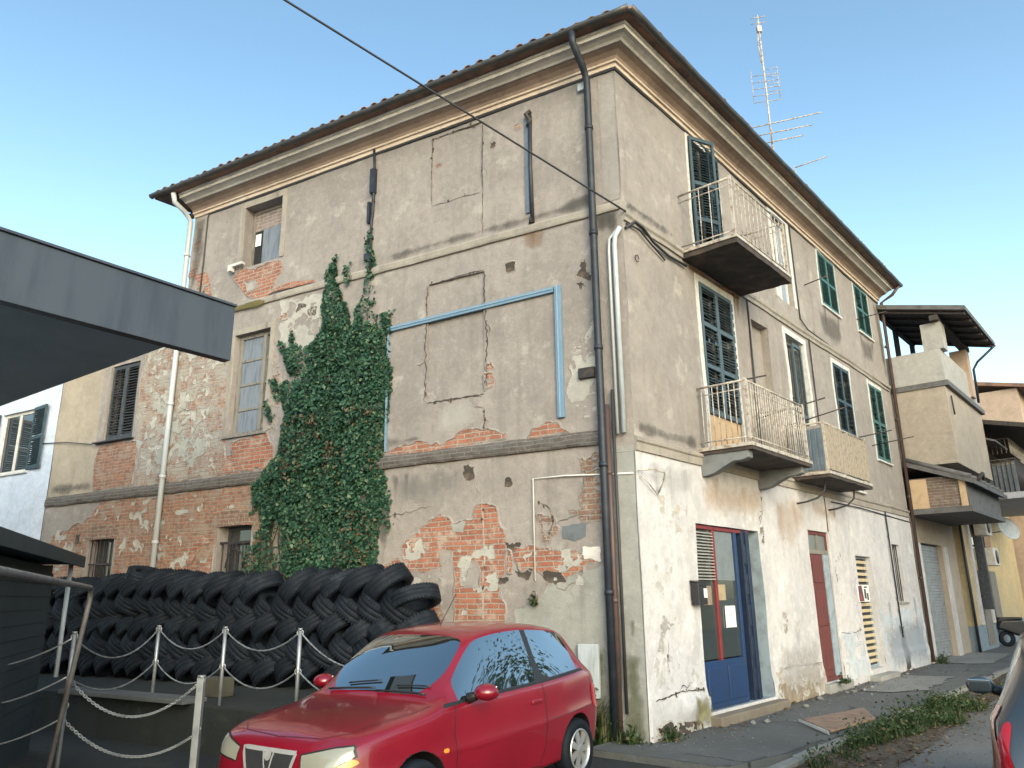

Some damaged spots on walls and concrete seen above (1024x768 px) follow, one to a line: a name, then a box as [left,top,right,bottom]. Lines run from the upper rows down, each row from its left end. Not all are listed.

crack [430,121,487,233]
flaking render [574,259,592,289]
crack [419,270,490,436]
peeling [565,320,598,425]
flaking render [49,259,341,578]
flaking render [379,426,508,457]
flaking render [462,464,475,482]
flaking render [527,420,570,439]
flaking render [568,450,602,525]
flaking render [383,502,597,622]
crack [656,645,705,702]